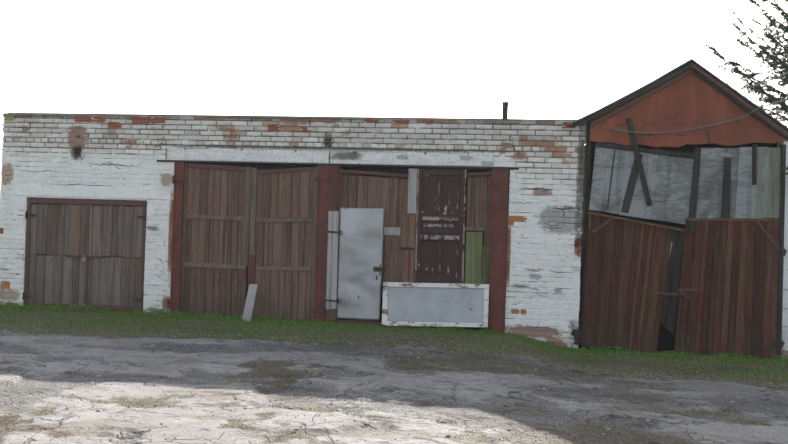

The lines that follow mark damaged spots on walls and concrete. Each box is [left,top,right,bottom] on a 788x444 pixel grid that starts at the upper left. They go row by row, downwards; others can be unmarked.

peeling [69,116,122,149]
peeling [501,142,527,159]
peeling [2,163,14,185]
spalling [504,325,561,338]
crack [265,355,404,444]
crack [387,374,673,435]